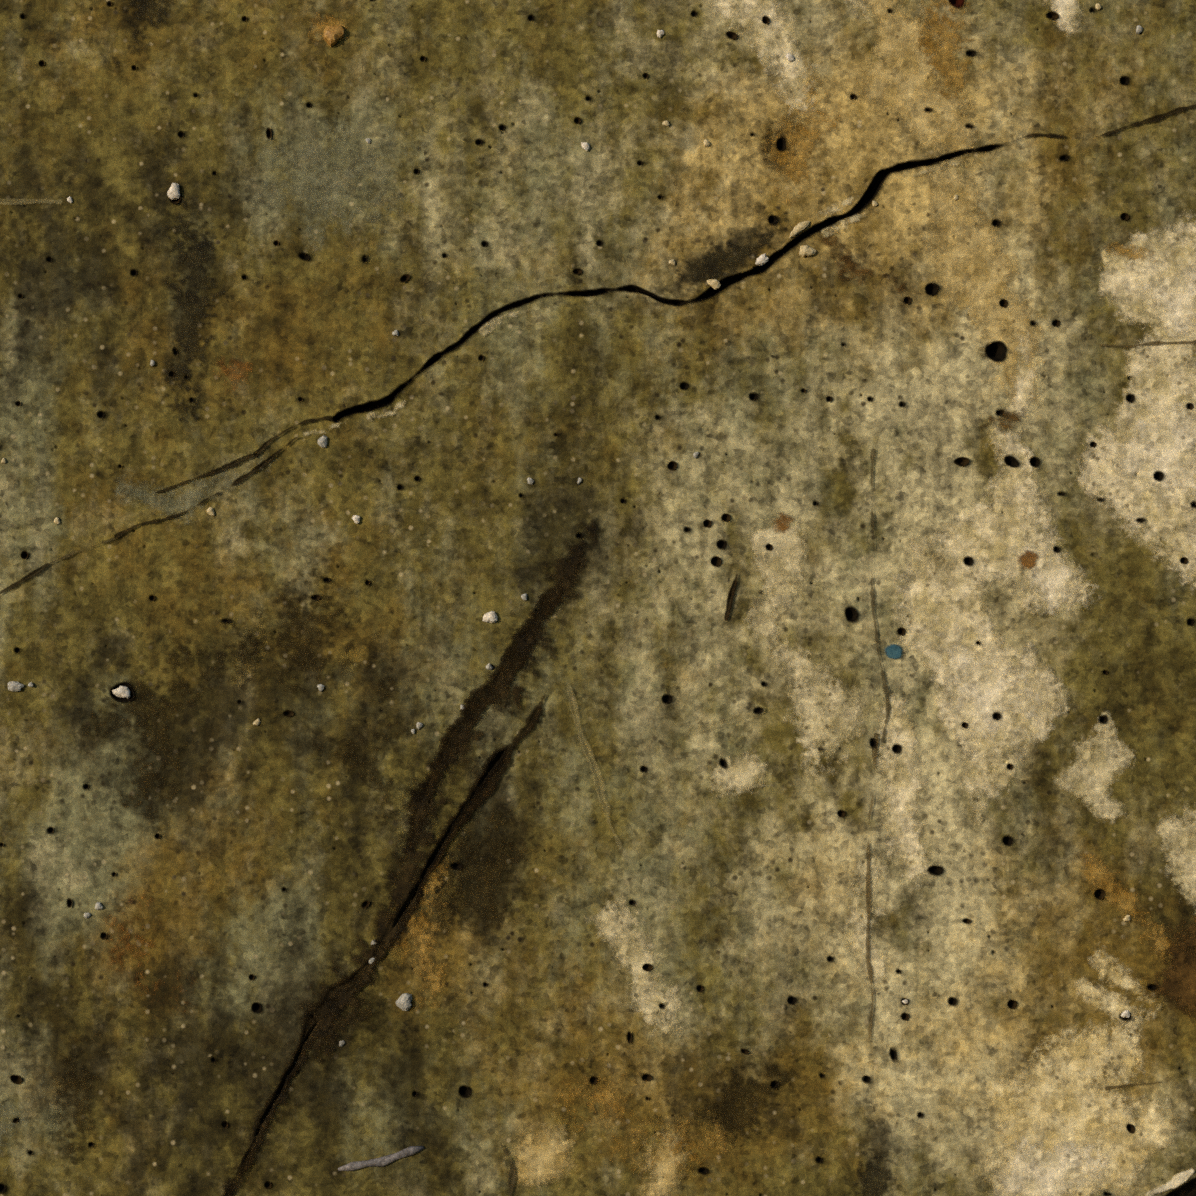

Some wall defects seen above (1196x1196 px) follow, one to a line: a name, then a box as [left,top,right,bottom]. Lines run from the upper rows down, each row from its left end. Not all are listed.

leakage [709,0,818,110]
crack [1096,105,1196,137]
crack [0,133,1066,594]
crack [1099,340,1196,348]
crack [724,574,738,621]
crack [221,520,599,1196]
crack [866,578,890,1042]